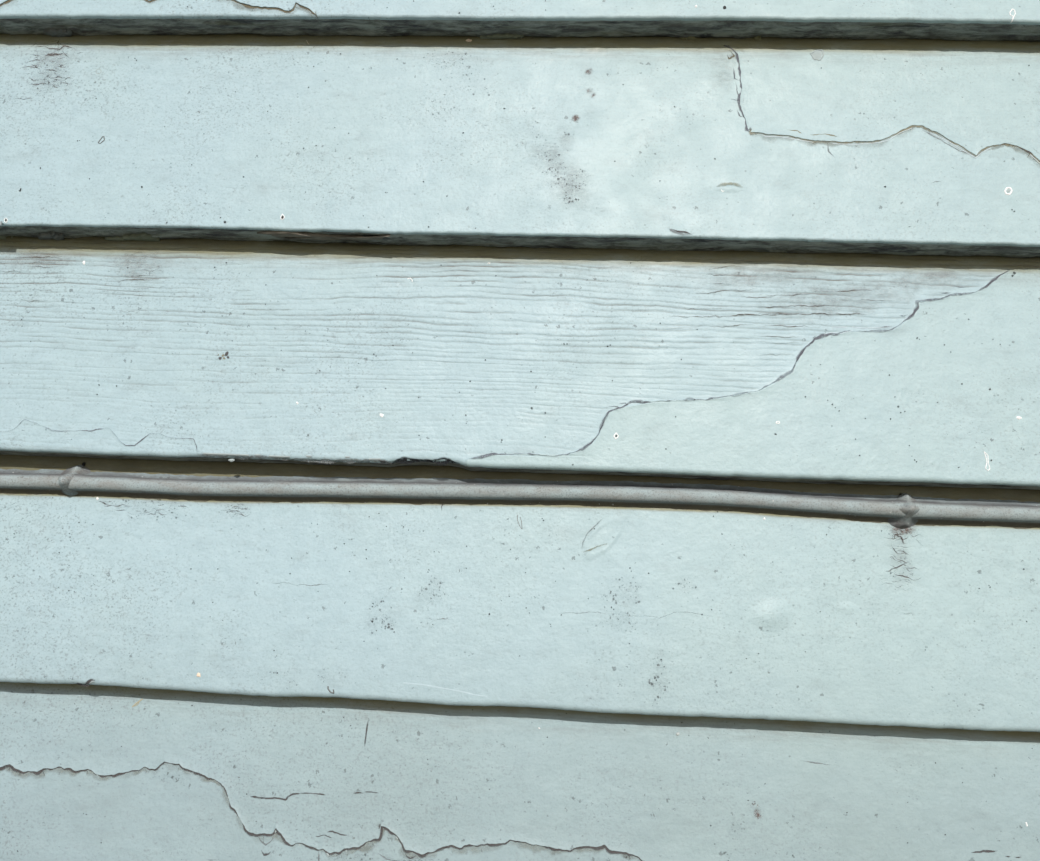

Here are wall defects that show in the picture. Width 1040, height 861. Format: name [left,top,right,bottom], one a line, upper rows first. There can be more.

spalling [810,49,824,61]
spalling [713,182,744,193]